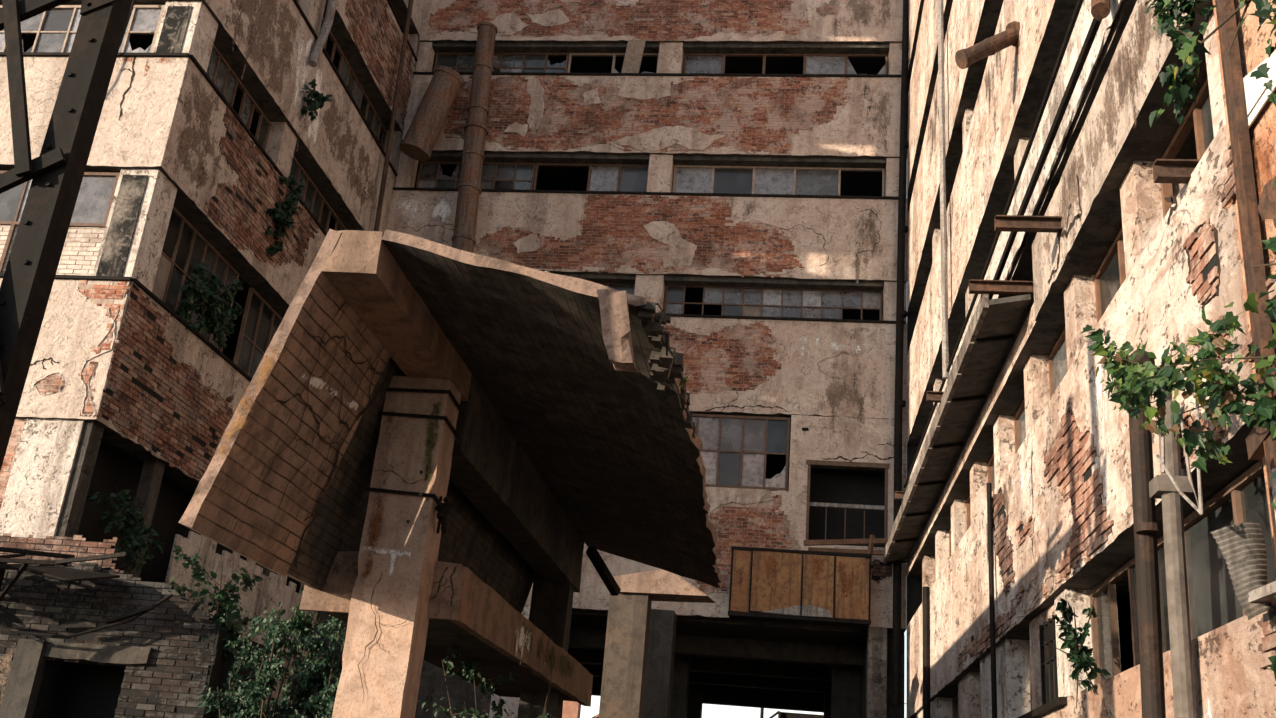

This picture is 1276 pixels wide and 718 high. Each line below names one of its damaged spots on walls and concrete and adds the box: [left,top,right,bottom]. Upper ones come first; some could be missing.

peeling [443,76,473,140]
peeling [485,75,850,155]